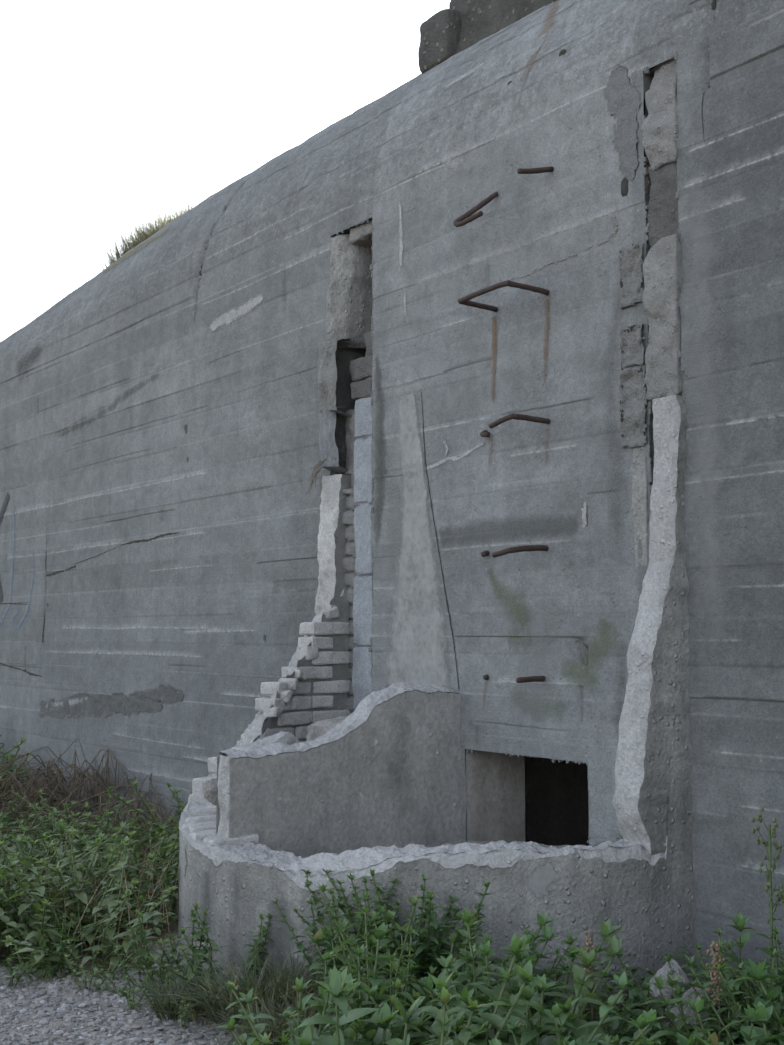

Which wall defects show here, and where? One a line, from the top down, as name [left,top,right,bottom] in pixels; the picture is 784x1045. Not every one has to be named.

crack [688,0,716,22]
spalling [604,65,648,181]
spalling [315,474,342,615]
spalling [612,350,685,854]
spalling [38,684,184,720]
spalling [217,682,460,763]